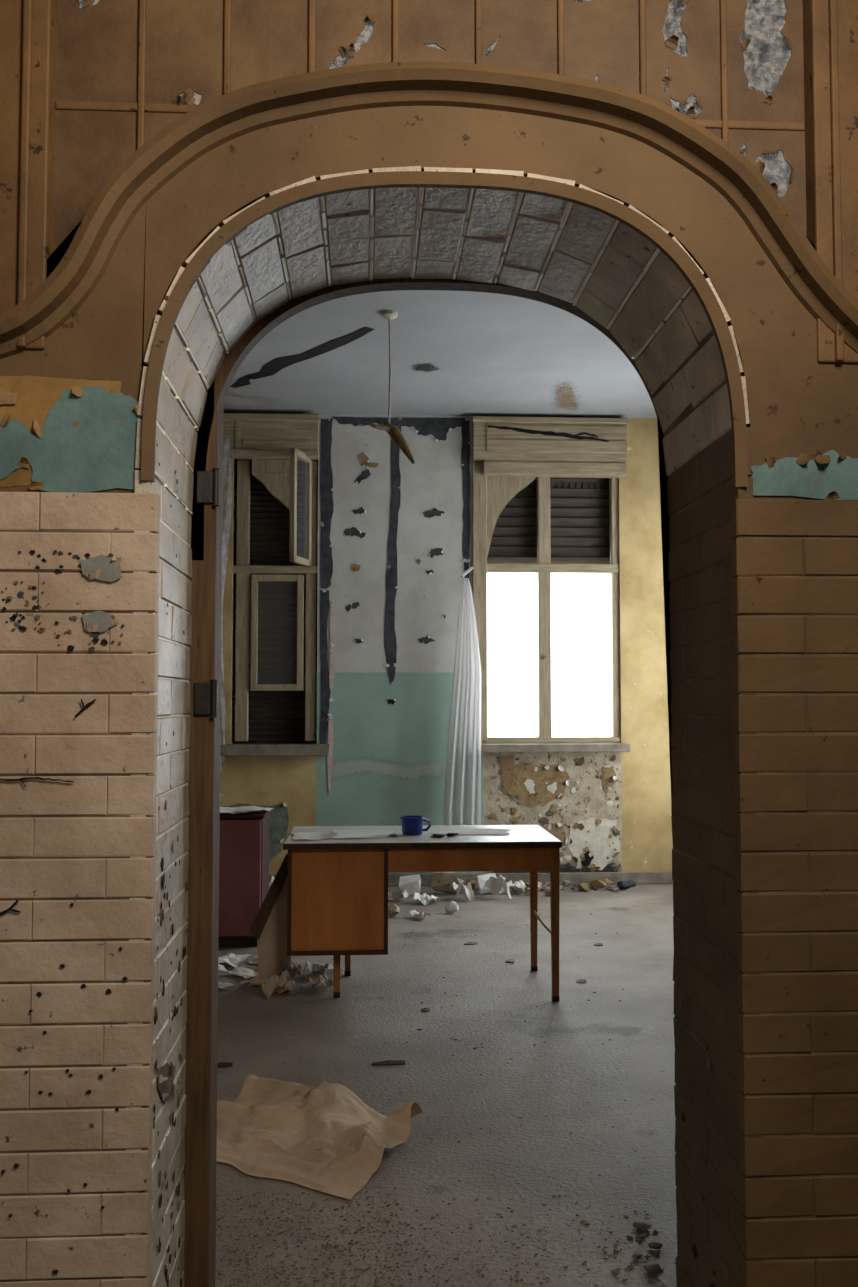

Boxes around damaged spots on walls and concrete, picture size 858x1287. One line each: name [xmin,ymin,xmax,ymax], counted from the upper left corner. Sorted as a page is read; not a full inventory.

peeling [665,35,679,50]
peeling [0,376,142,493]
peeling [748,450,858,500]
peeling [1,550,125,653]
spalling [488,755,621,872]